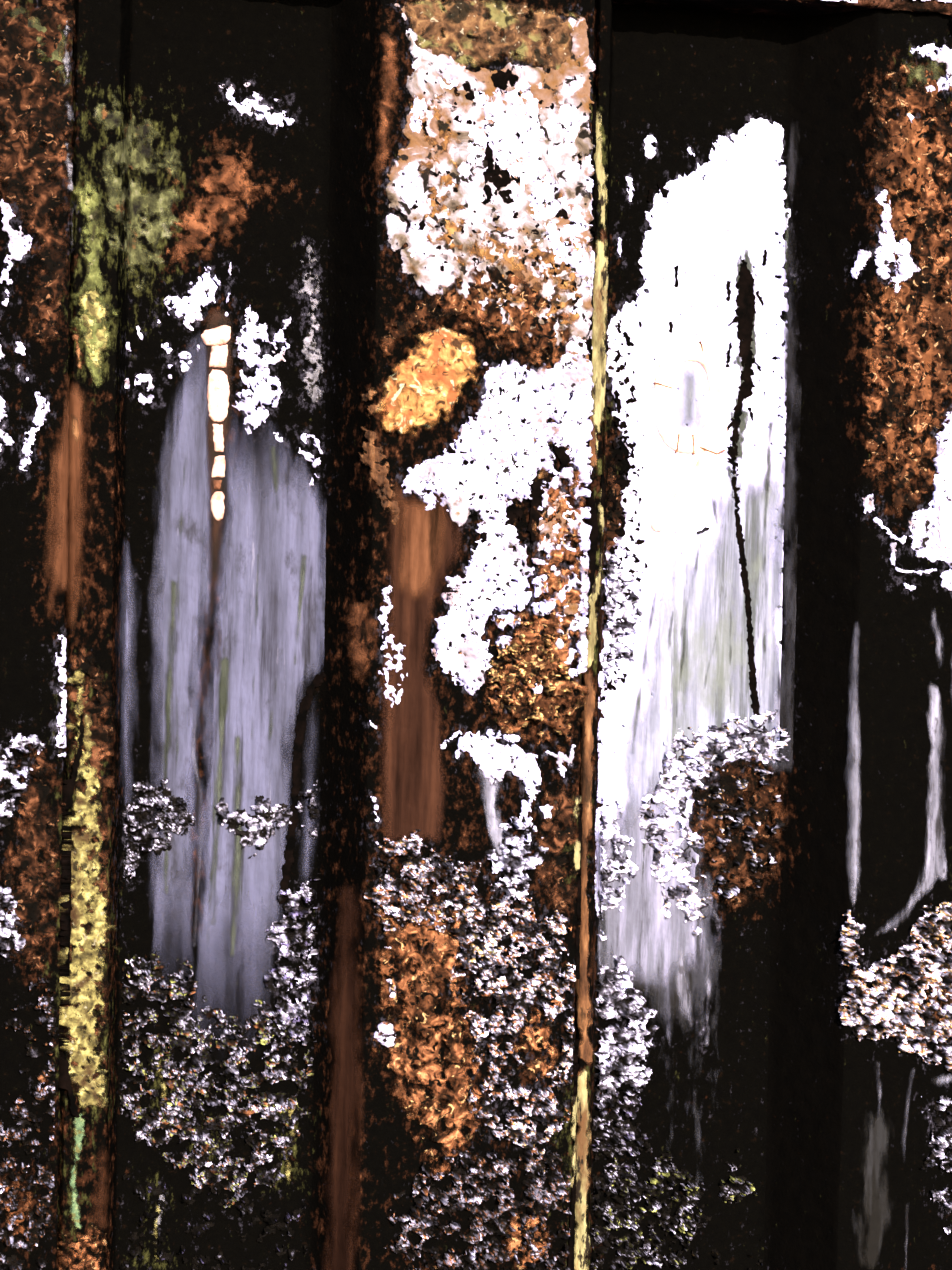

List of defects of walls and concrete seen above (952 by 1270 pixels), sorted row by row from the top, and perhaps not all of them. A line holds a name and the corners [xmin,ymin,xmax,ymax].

peeling [0,199,33,306]
peeling [0,377,50,471]
rust [0,0,81,368]
peeling [157,263,232,379]
peeling [232,245,324,442]
rust [347,86,588,841]
peeling [385,3,795,918]
peeling [850,190,921,293]
rust [860,62,952,516]
peeling [862,494,952,591]
rust [372,888,482,1179]
rust [507,1215,548,1269]